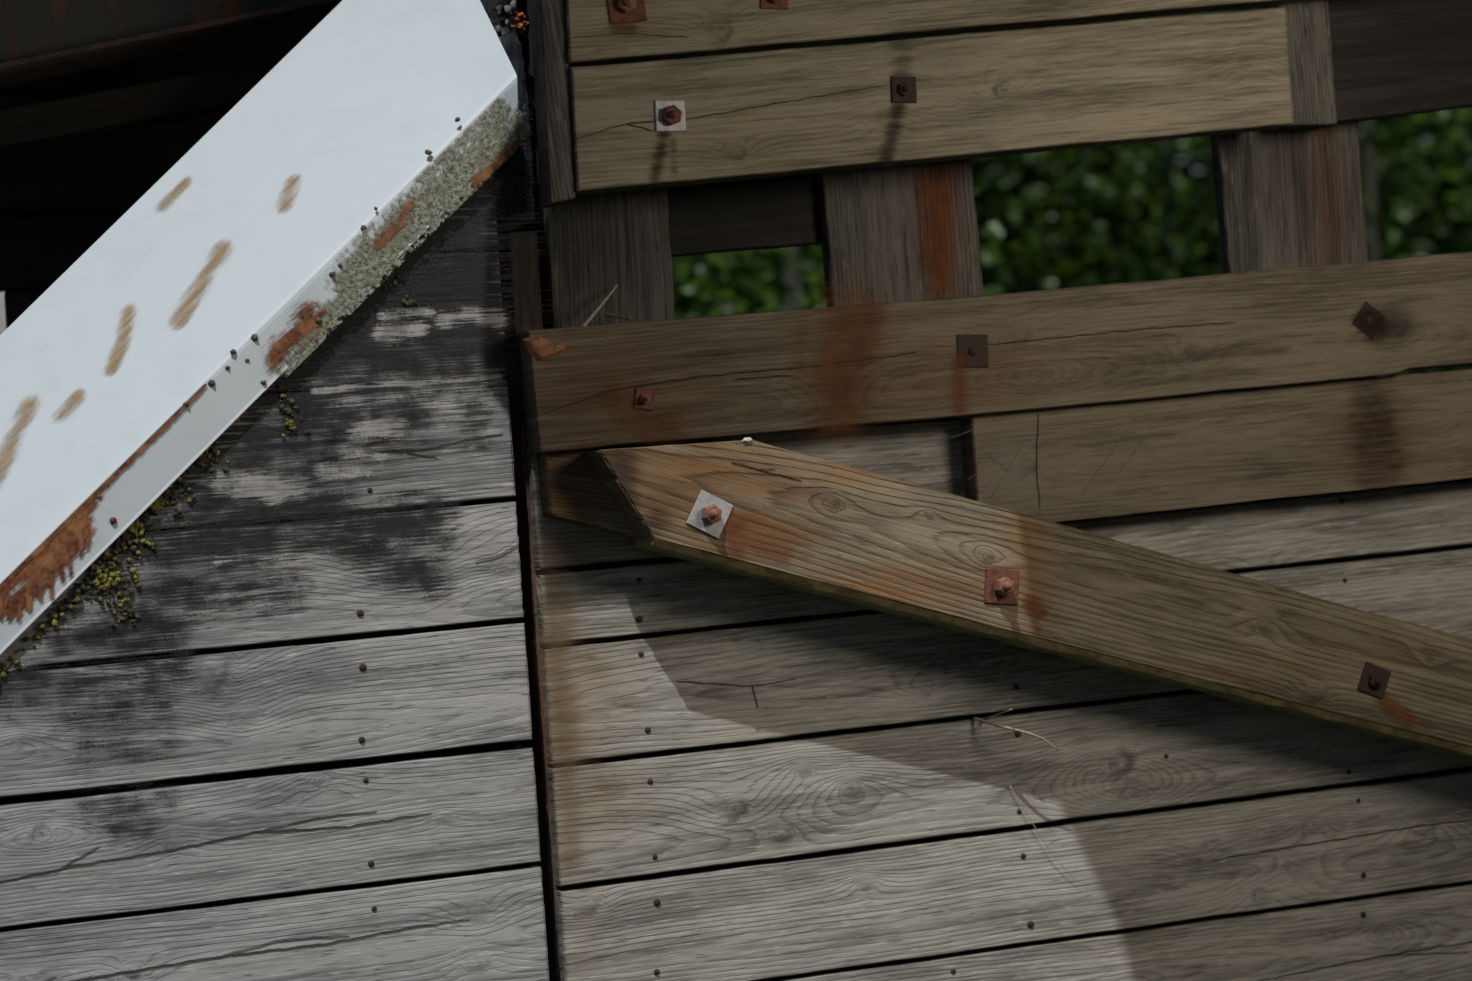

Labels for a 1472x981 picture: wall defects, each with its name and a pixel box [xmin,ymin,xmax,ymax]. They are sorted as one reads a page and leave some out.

rust [470,114,521,186]
rust [372,200,415,250]
rust [266,301,325,375]
rust [0,384,207,622]
damp [0,98,571,843]
crack [0,811,432,882]
crack [43,919,466,981]